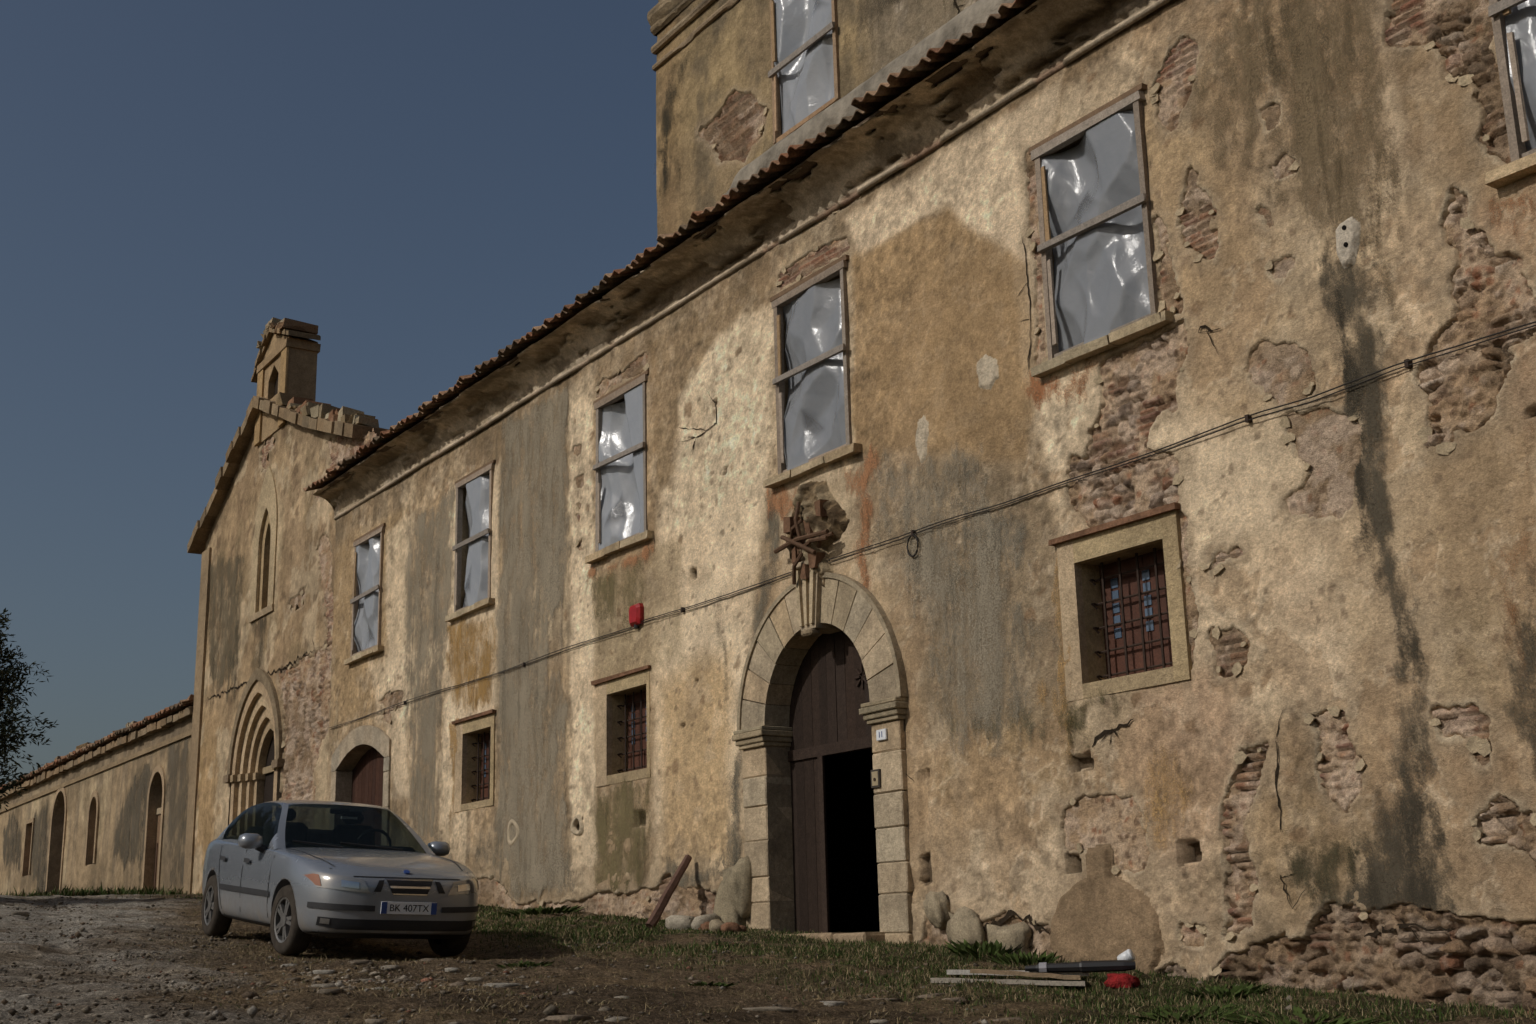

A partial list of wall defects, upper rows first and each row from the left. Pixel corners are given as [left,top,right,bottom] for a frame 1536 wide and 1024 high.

flaking render [699,91,768,163]
flaking render [1149,37,1199,132]
flaking render [1385,0,1511,164]
flaking render [1416,188,1536,455]
flaking render [1069,168,1250,678]
damp [1195,0,1457,912]
flaking render [1304,706,1366,813]
flaking render [1429,705,1492,765]
flaking render [1162,743,1536,1015]